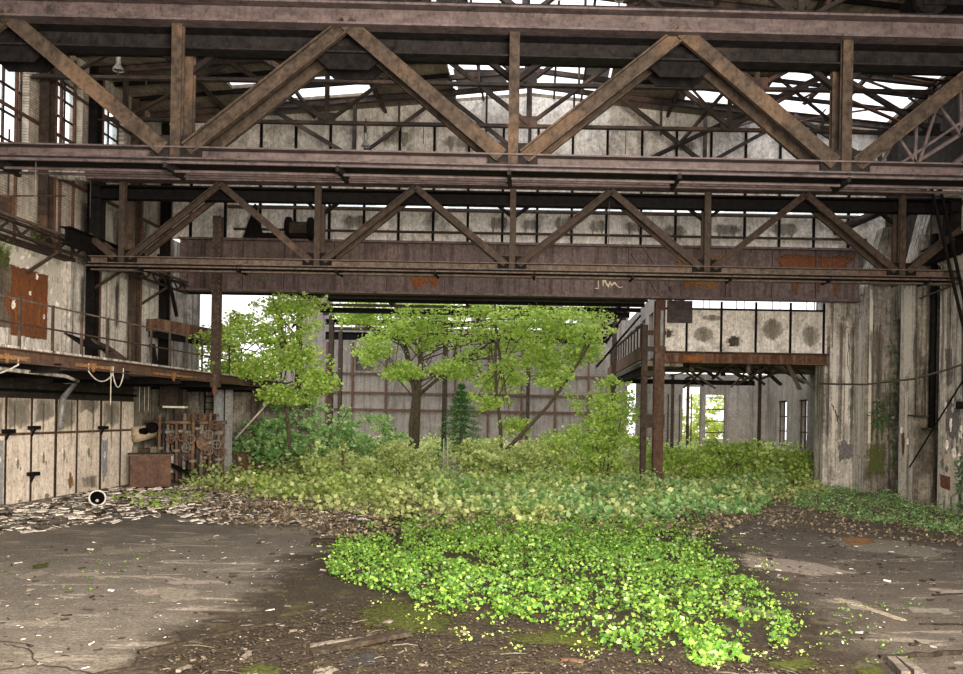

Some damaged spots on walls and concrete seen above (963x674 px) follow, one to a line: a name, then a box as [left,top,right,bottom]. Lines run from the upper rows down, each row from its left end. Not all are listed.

rust [776,254,853,268]
rust [4,265,48,340]
water stain [694,315,720,341]
water stain [763,319,780,339]
water stain [803,288,885,466]
water stain [0,400,119,443]